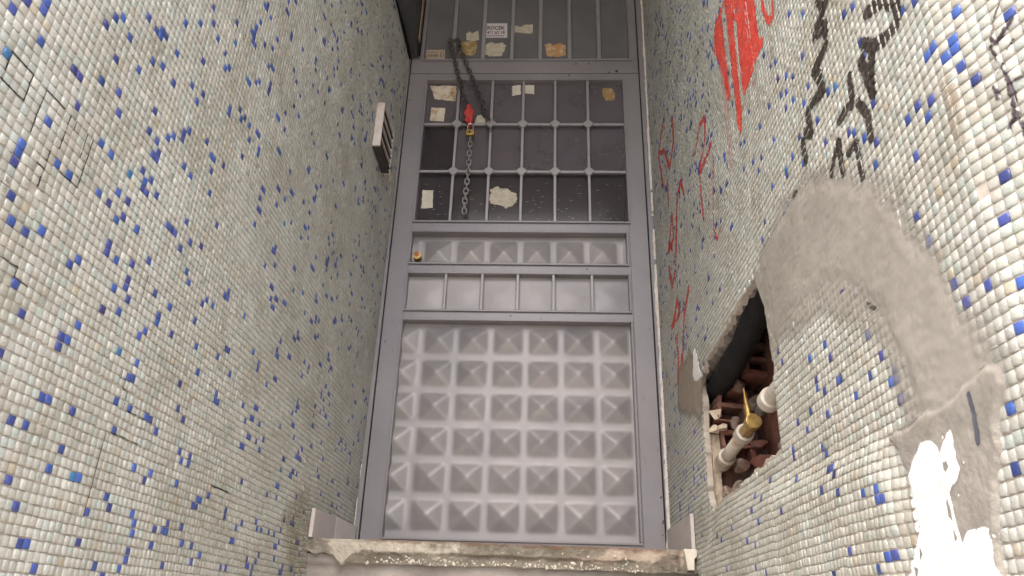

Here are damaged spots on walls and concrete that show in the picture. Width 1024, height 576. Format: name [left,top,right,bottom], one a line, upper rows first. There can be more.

crack [1,51,94,188]
spalling [704,327,781,506]
spalling [306,538,698,574]